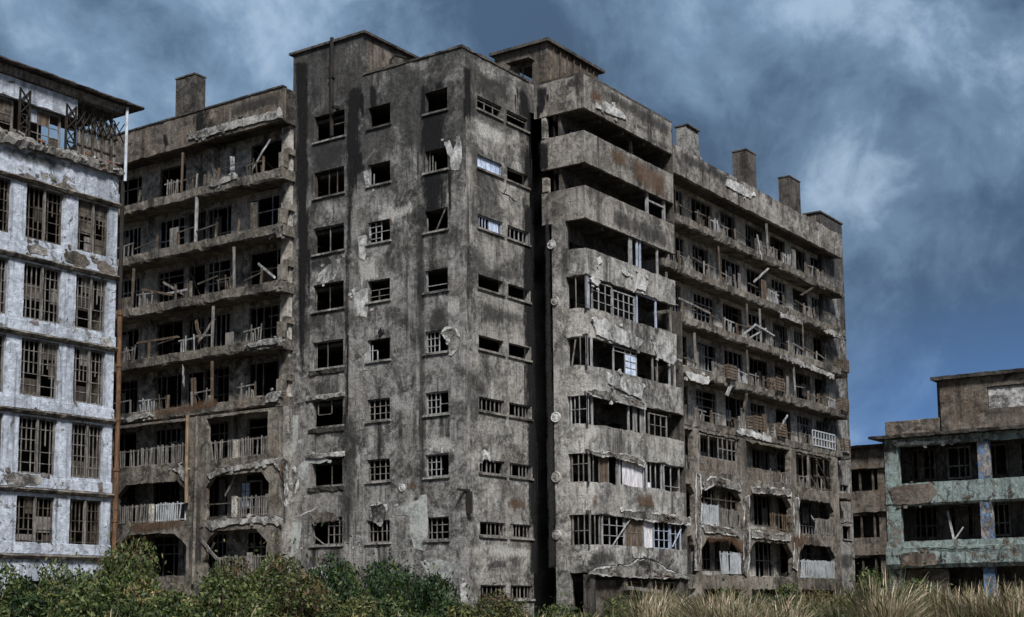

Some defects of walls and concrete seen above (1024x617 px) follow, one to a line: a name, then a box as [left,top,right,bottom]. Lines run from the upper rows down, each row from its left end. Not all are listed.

spalling [187,107,283,141]
peeling [594,100,627,122]
peeling [441,136,462,170]
peeling [26,239,119,280]
damp [294,63,376,540]
damp [416,81,451,493]
spalling [440,326,460,356]
peeling [592,317,710,385]
spalling [199,457,299,531]
spalling [369,499,398,527]
spalling [589,473,800,579]
peeling [883,481,937,509]